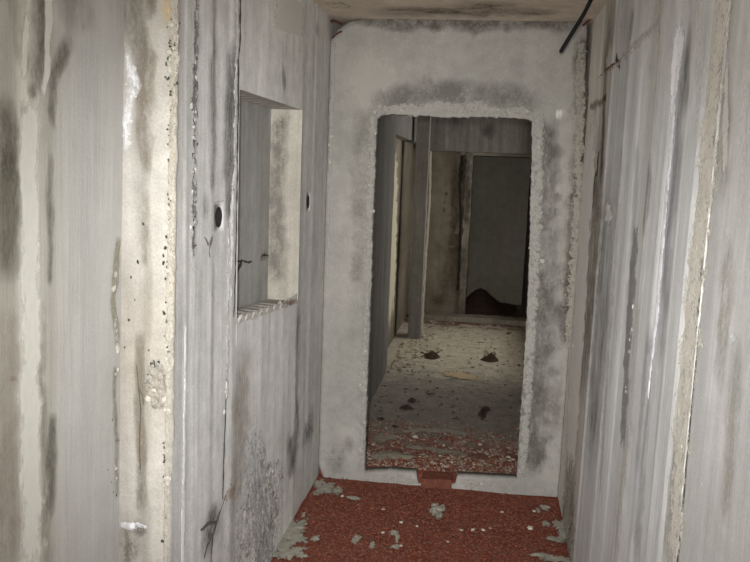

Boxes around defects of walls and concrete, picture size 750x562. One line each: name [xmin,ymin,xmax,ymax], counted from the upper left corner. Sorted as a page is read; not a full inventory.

damp [21,0,69,95]
damp [537,42,589,215]
damp [0,104,56,562]
spalling [144,0,180,562]
crack [201,0,269,562]
damp [534,271,554,331]
damp [526,375,545,465]